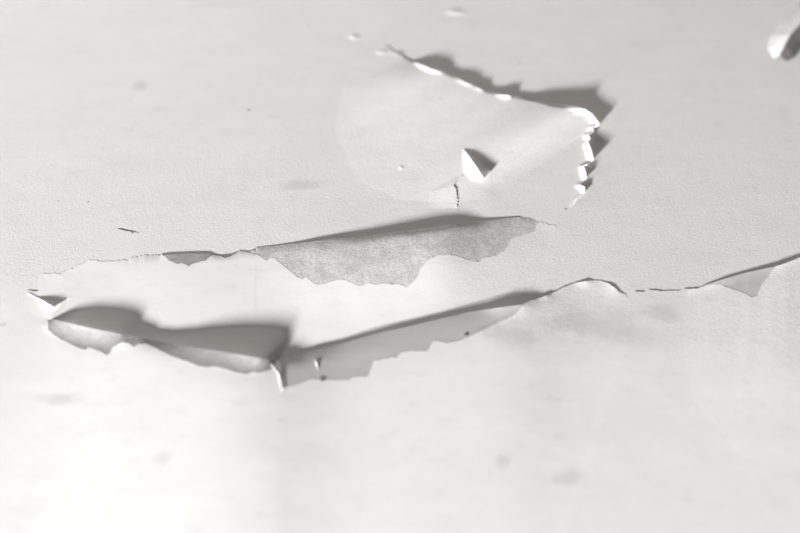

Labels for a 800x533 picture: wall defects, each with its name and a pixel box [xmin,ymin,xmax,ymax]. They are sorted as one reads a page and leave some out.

peeling [335,50,599,210]
peeling [0,217,629,533]